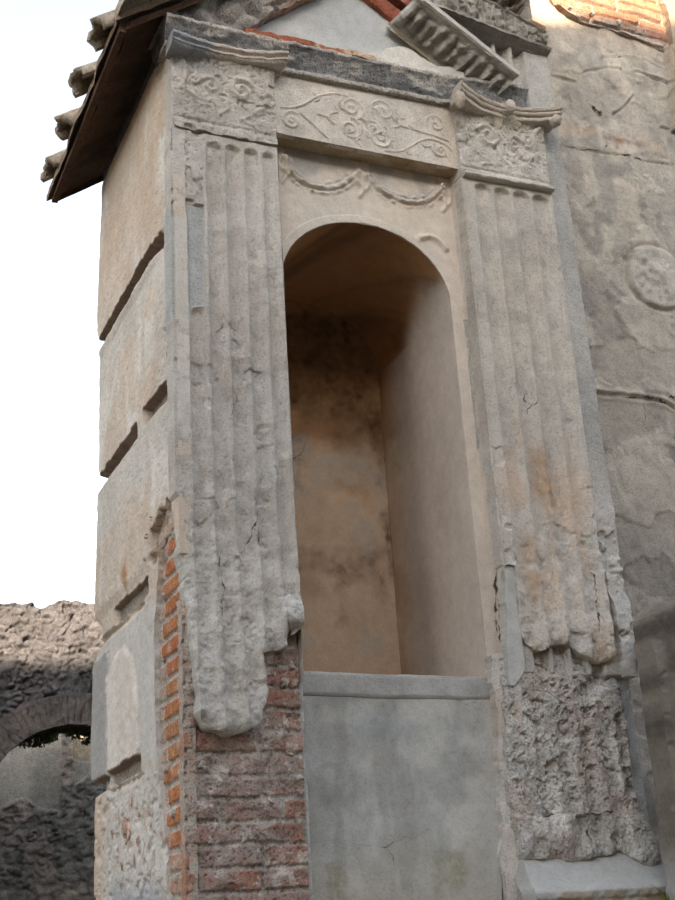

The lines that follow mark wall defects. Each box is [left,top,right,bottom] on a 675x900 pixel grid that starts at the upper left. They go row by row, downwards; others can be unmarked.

spalling [499,647,661,867]